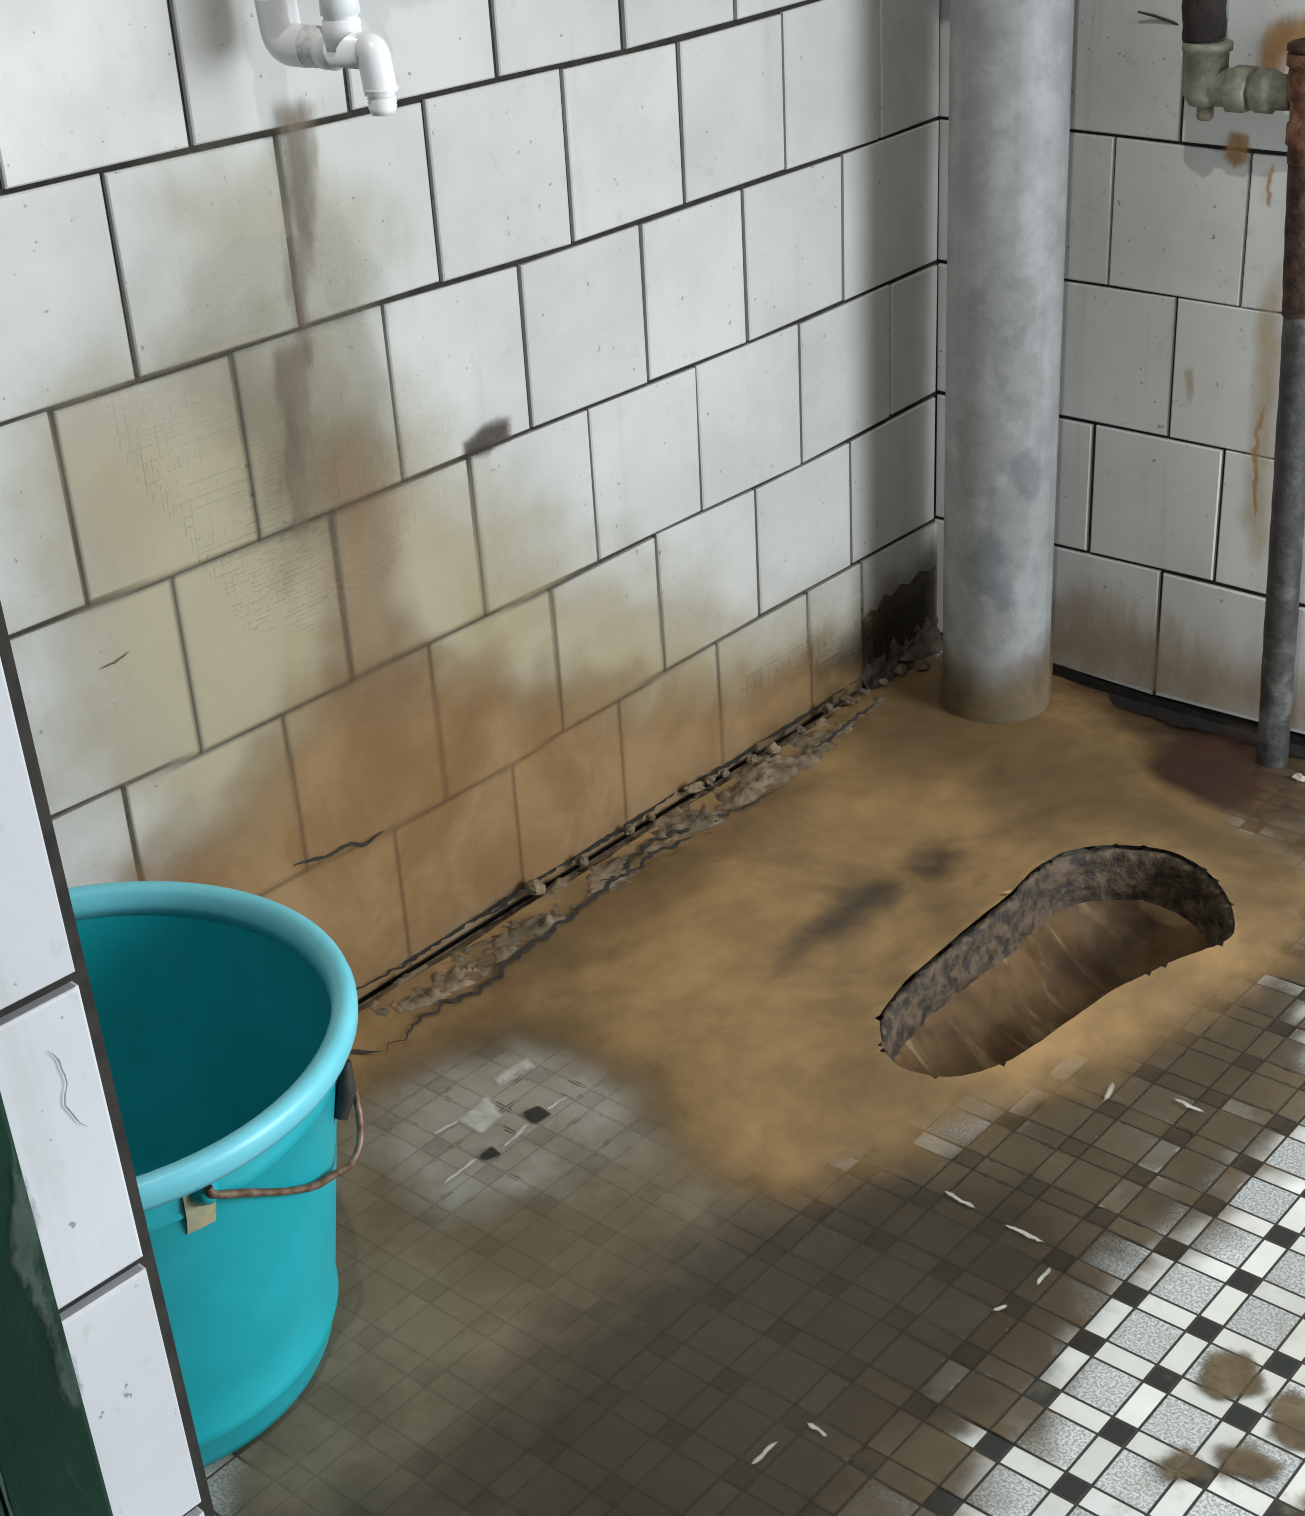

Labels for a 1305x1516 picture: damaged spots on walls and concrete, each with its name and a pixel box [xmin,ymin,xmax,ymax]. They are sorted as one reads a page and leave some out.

corrosion [1262,19,1305,70]
leakage [56,106,937,1000]
spalling [358,521,943,1017]